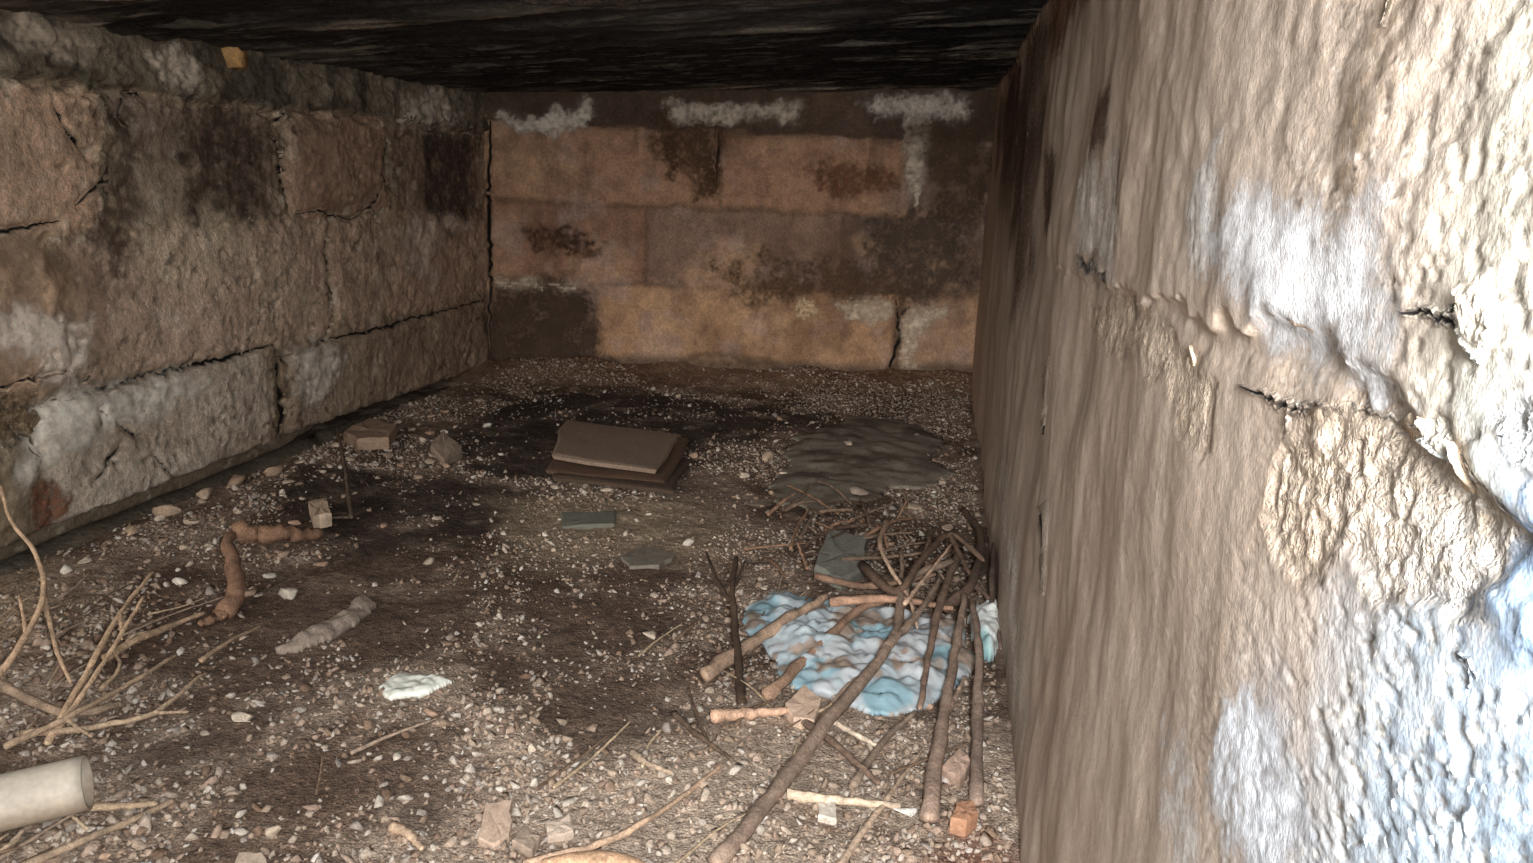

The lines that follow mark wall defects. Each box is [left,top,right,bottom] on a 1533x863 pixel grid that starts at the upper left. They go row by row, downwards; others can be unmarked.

water stain [0,11,95,68]
crack [0,85,139,238]
water stain [87,109,141,278]
water stain [99,0,1056,369]
water stain [1075,78,1119,287]
water stain [1185,0,1402,411]
crack [0,109,498,483]
crack [1398,303,1482,365]
crack [1237,384,1490,491]